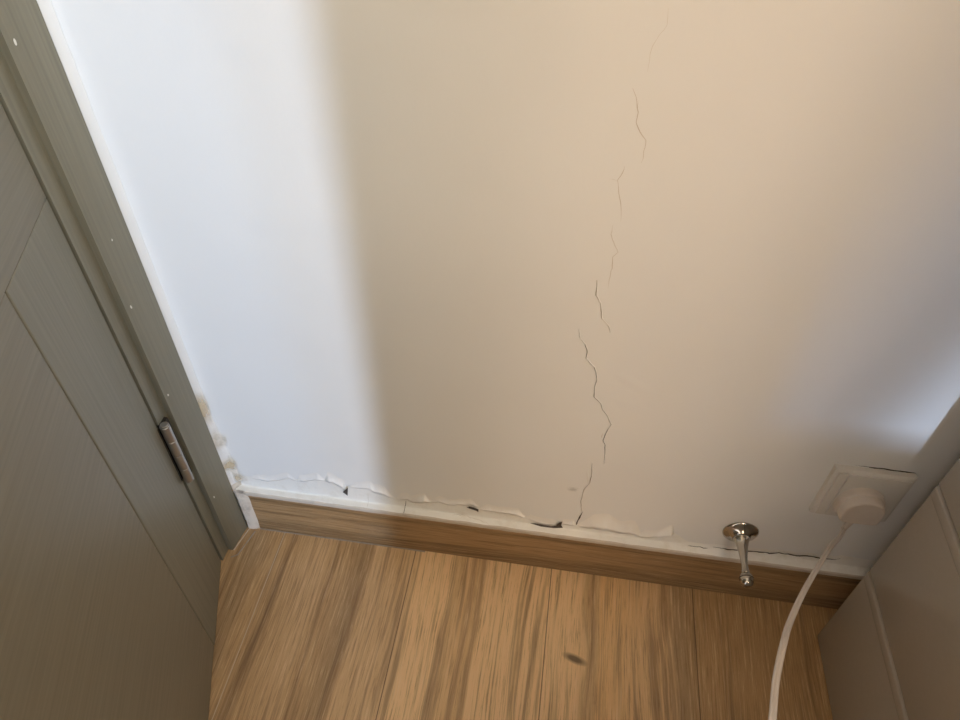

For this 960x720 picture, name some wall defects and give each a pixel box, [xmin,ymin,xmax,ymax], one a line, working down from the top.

crack [595,227,618,334]
crack [575,329,612,526]
peeling [249,472,563,528]